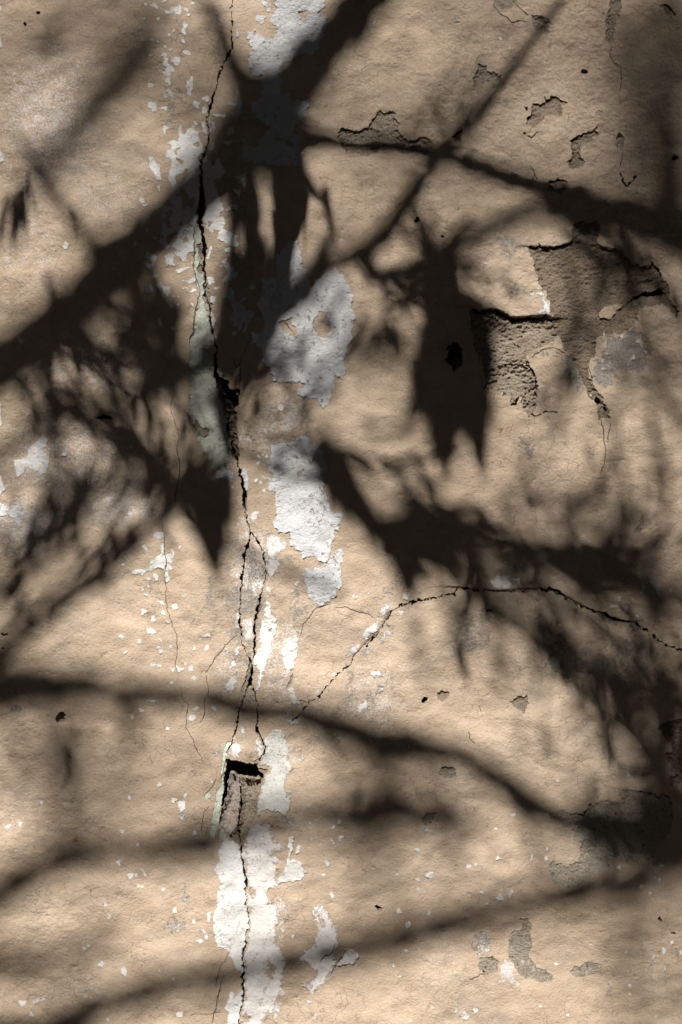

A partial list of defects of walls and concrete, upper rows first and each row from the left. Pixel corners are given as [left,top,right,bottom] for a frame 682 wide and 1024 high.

spalling [337,110,434,156]
spalling [523,96,567,138]
spalling [567,110,602,169]
crack [162,0,267,761]
spalling [445,221,679,421]
peeling [133,0,359,1024]
peeling [121,532,196,684]
peeling [353,669,384,715]
crack [292,586,682,720]
peeling [18,993,49,1016]
crack [192,829,250,1024]
spalling [469,918,558,991]